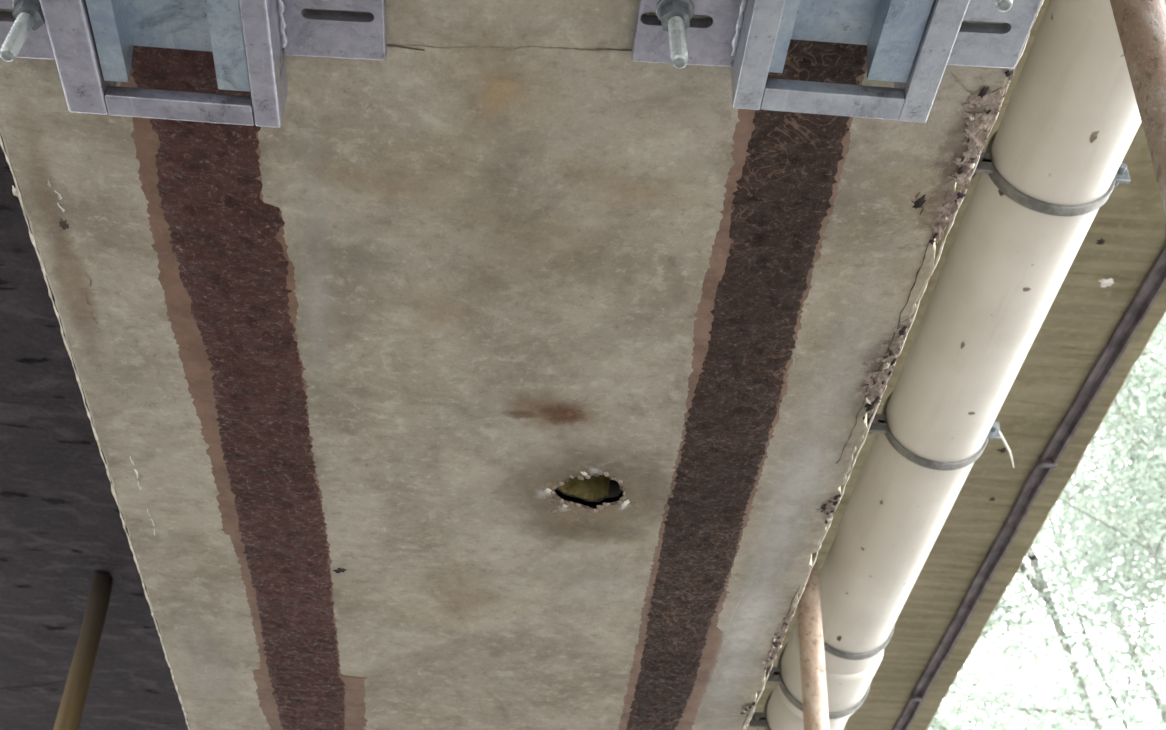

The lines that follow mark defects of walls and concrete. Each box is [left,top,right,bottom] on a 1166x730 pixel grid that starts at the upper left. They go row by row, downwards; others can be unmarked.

crack [387,43,632,51]
spalling [911,60,1019,250]
spalling [861,317,912,420]
rust [513,403,581,421]
spalling [538,468,630,513]
spalling [816,491,842,524]
spalling [760,608,795,672]